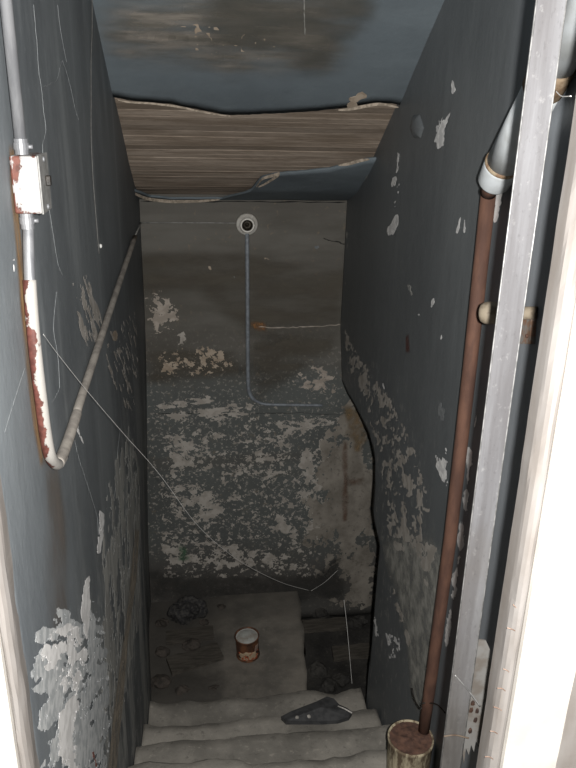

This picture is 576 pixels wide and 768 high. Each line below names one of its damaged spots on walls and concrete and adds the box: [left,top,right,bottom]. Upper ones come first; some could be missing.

water stain [114,0,366,68]
flaking render [114,92,398,203]
peeling [434,113,450,149]
peeling [387,153,399,236]
peeling [145,291,233,376]
peeling [435,448,448,486]
flaking render [156,330,441,707]
peeling [30,426,141,768]